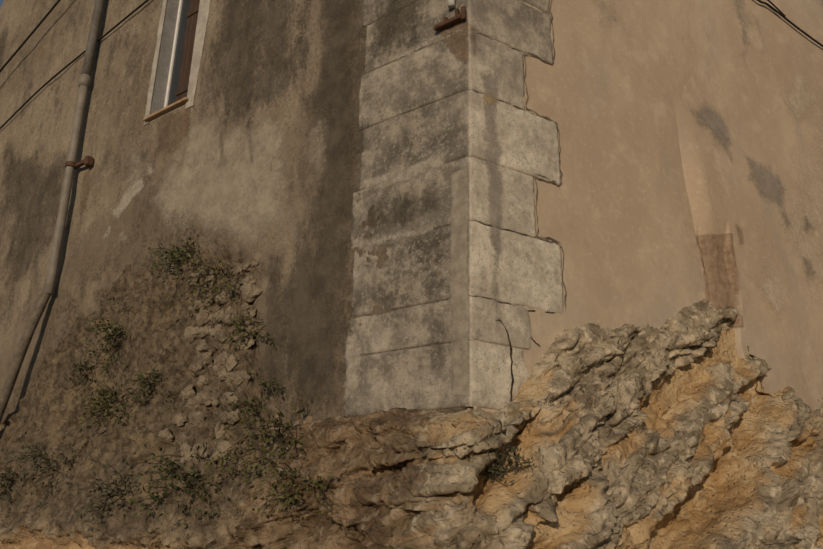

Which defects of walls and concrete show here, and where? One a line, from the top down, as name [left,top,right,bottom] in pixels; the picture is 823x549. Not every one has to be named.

damp [209,0,311,128]
damp [2,151,65,285]
damp [266,0,363,400]
flaking render [158,258,263,464]